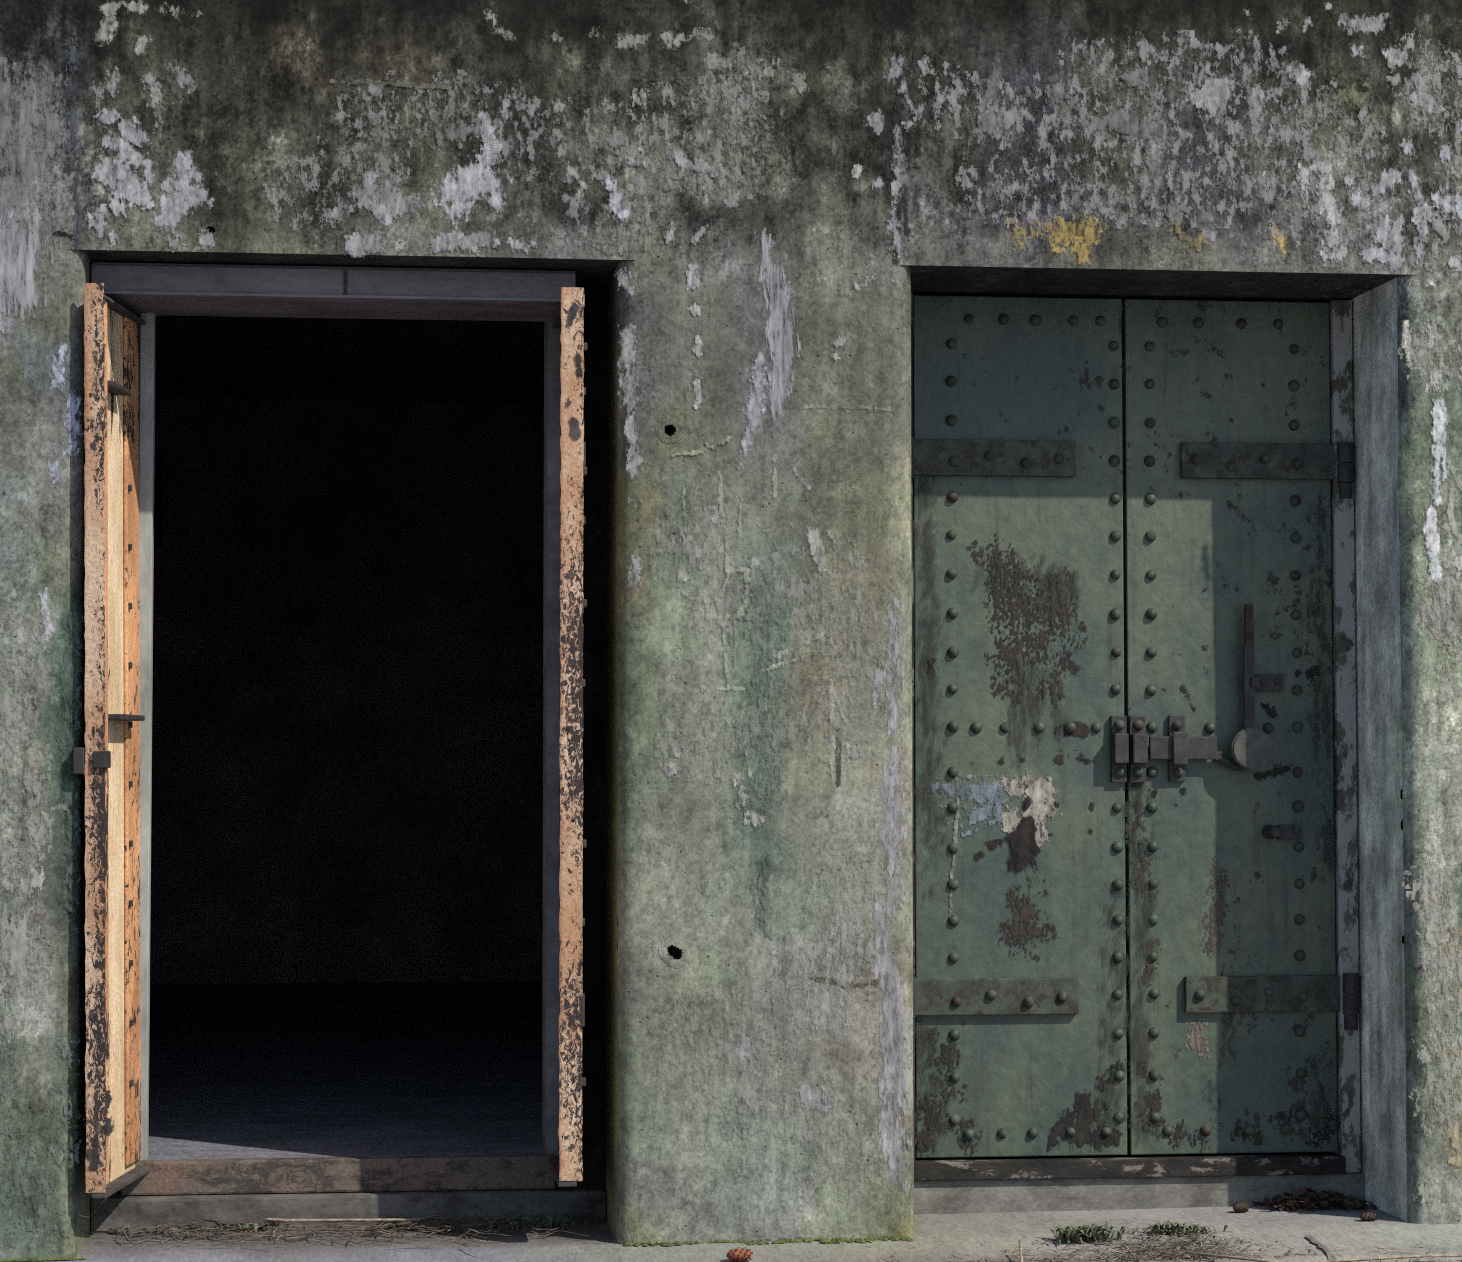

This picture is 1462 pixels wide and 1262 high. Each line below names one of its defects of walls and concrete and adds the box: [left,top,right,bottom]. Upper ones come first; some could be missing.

peeling [133,35,154,55]
peeling [95,0,202,47]
peeling [483,8,516,41]
peeling [53,63,215,252]
peeling [851,164,862,180]
corrosion [913,475,951,896]
corrosion [967,534,1091,962]
peeling [999,771,1062,848]
corrosion [1294,494,1336,785]
corrosion [1047,782,1208,1154]
corrosion [915,1018,982,1158]
corrosion [1231,1043,1340,1149]